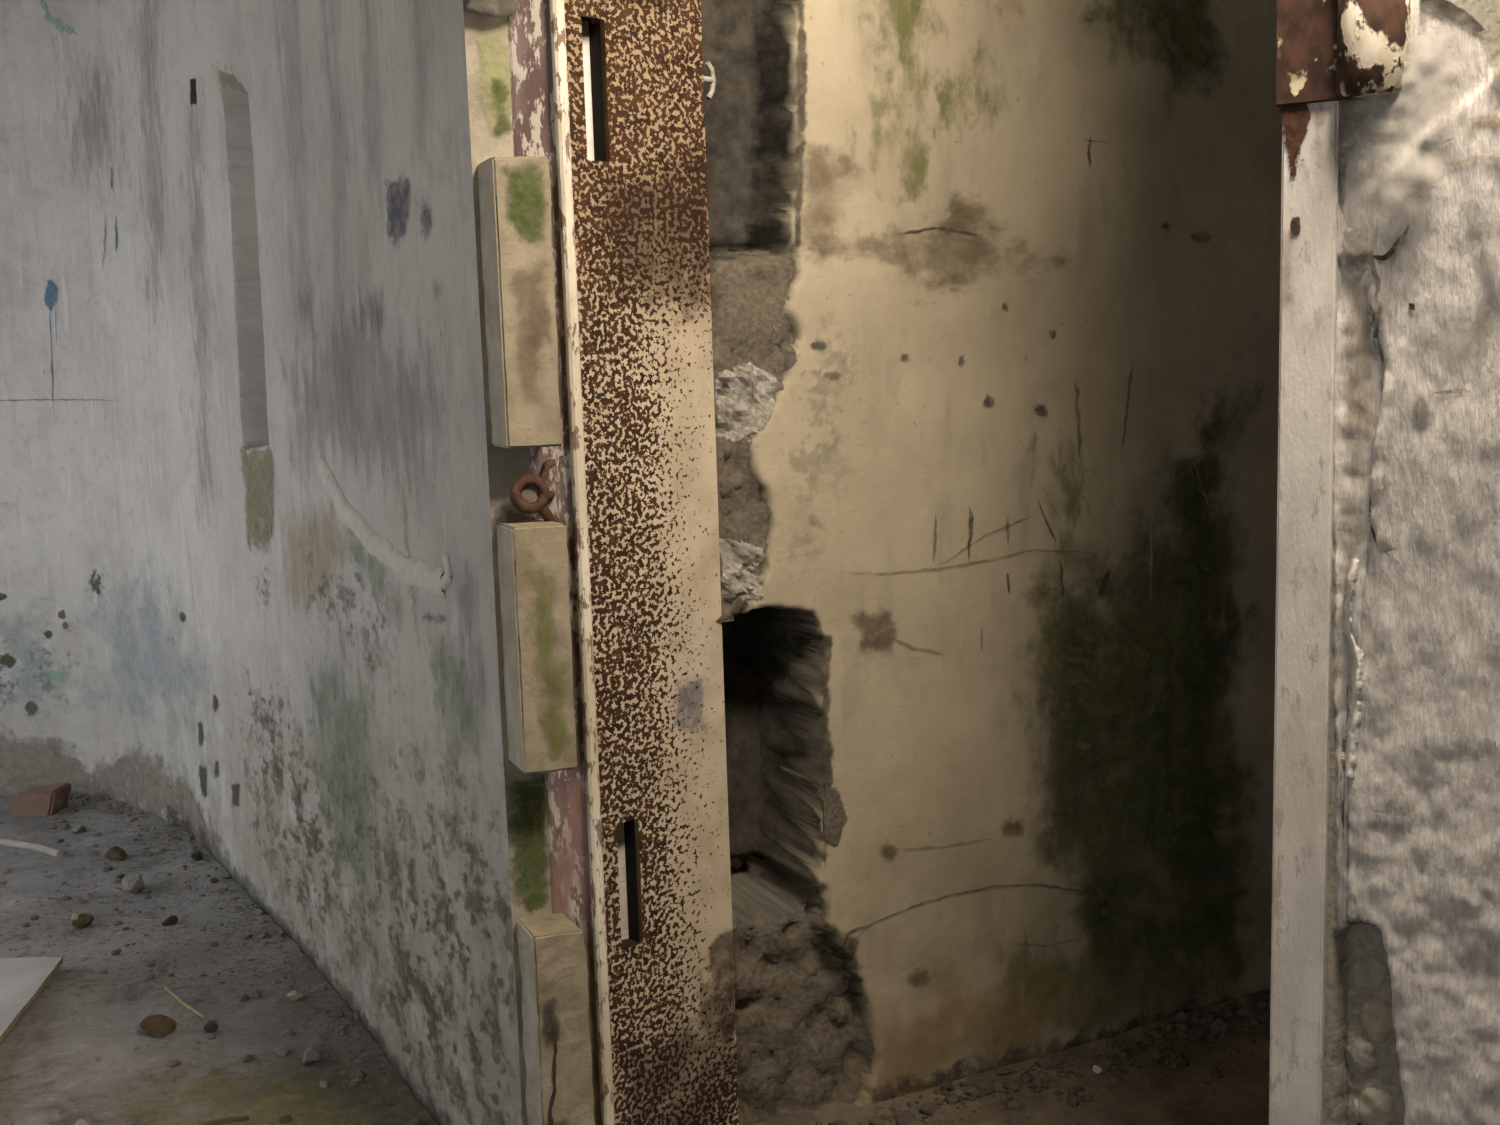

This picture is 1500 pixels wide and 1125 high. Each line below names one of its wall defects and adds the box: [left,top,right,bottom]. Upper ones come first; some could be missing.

corrosion [1279,104,1311,177]
damp [862,203,987,278]
spalling [710,0,807,622]
damp [88,571,102,595]
mould [43,610,68,639]
mould [0,654,49,688]
mould [25,701,37,715]
damp [197,695,218,746]
spalling [778,633,847,860]
damp [0,737,511,1125]
spalling [730,851,875,1125]